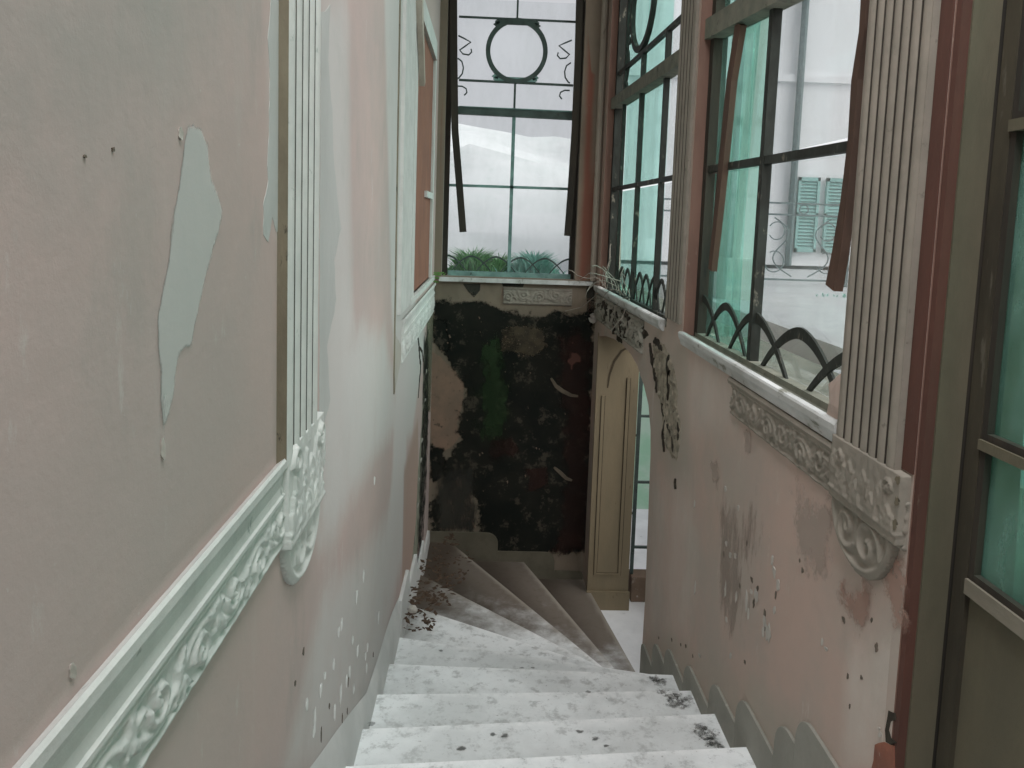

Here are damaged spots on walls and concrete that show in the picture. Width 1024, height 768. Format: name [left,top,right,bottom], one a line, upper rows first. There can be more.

peeling [263,0,279,241]
peeling [158,126,222,423]
water stain [417,284,595,563]
flaking render [641,329,681,460]
peeling [306,618,374,742]